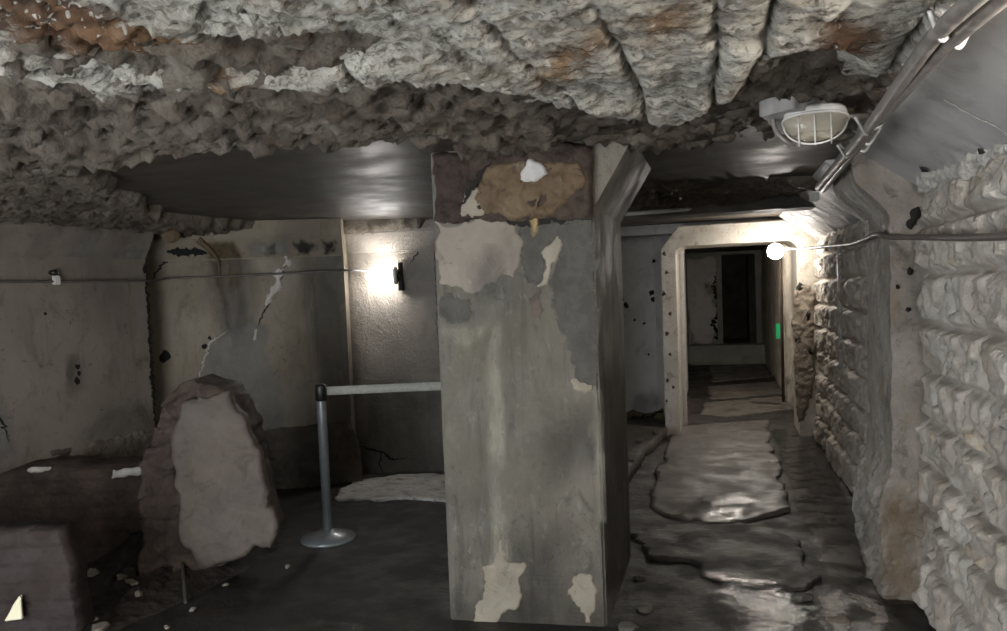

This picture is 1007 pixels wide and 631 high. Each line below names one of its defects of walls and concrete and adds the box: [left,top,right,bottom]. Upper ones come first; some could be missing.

rust [0,0,178,56]
crack [0,415,10,452]
crack [142,261,168,425]
spalling [432,142,600,623]